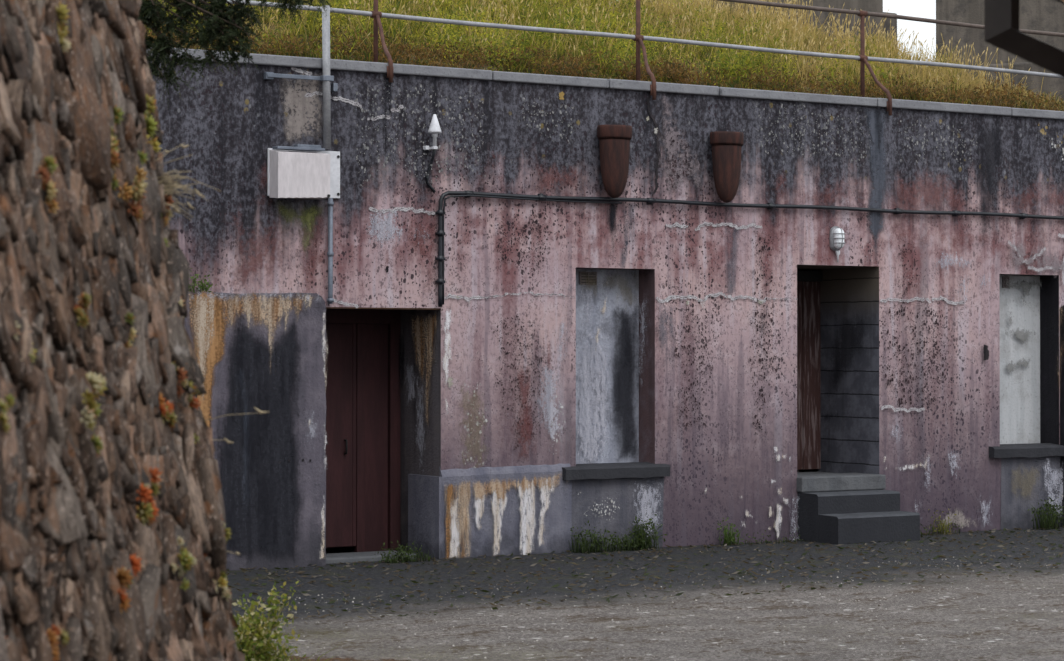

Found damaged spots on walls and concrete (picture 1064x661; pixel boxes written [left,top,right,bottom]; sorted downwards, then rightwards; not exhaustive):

water stain [868,110,886,247]
crack [1008,233,1064,284]
rust [189,286,319,427]
water stain [218,323,300,558]
rust [445,474,567,558]
water stain [577,285,668,464]
peeling [768,480,788,538]